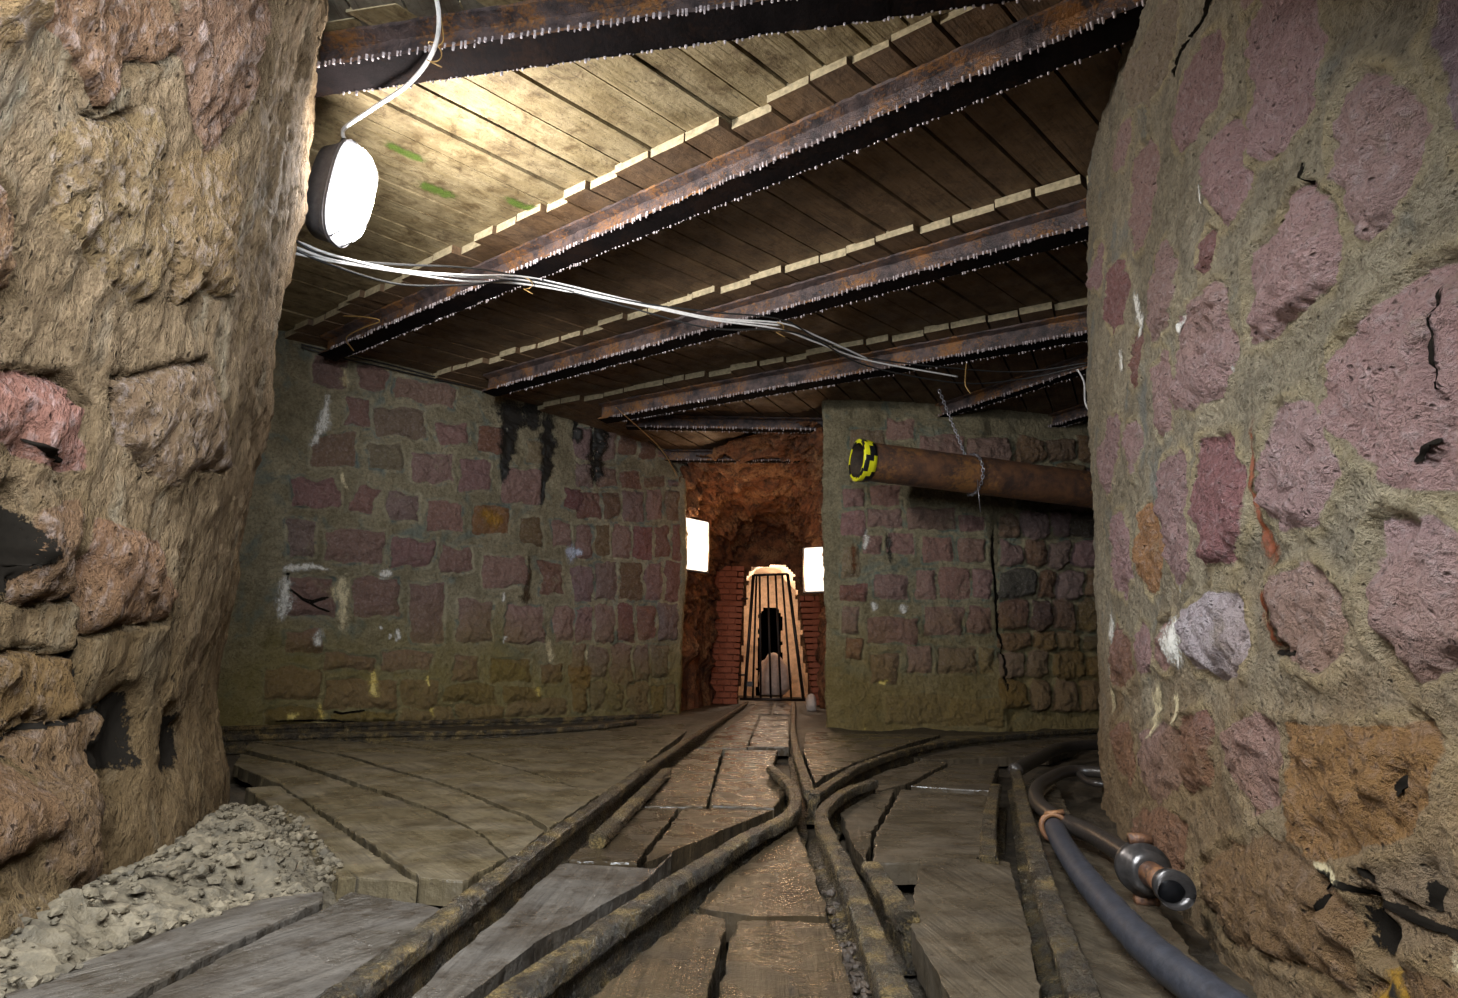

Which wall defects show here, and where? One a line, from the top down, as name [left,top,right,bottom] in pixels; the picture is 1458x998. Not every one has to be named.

crack [1171,0,1212,77]
damp [492,397,613,505]